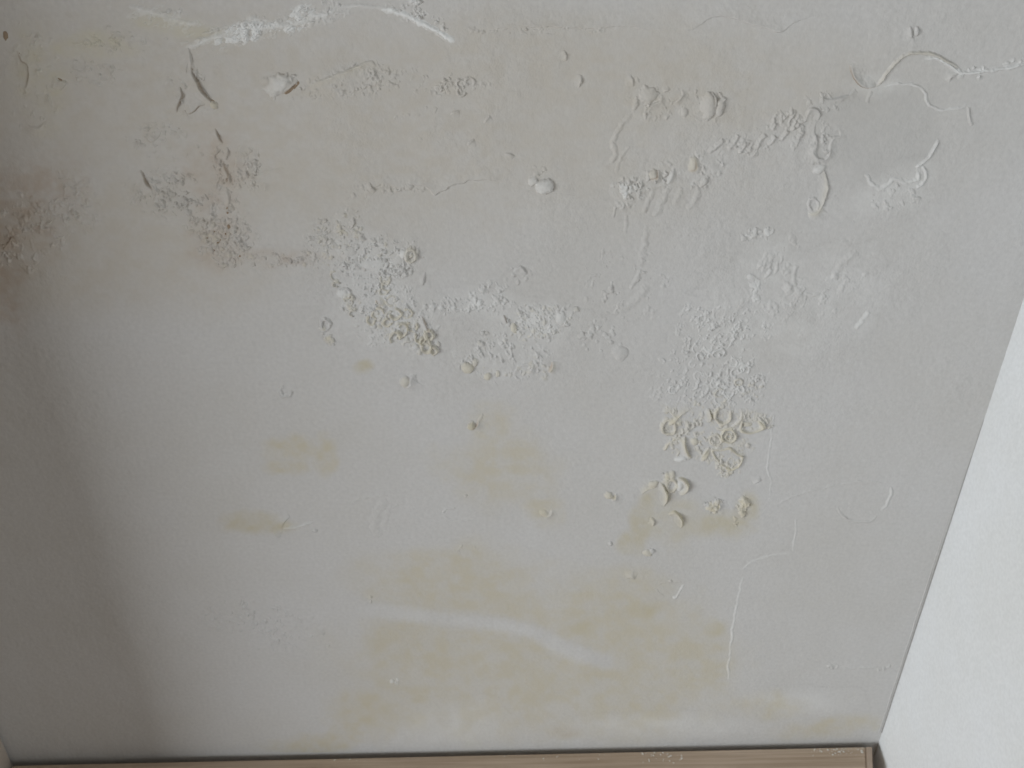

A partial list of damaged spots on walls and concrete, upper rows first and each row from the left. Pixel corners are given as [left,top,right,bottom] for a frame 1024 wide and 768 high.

spalling [128,165,341,272]
peeling [635,397,775,528]
leakage [248,395,885,753]
crack [726,518,798,680]